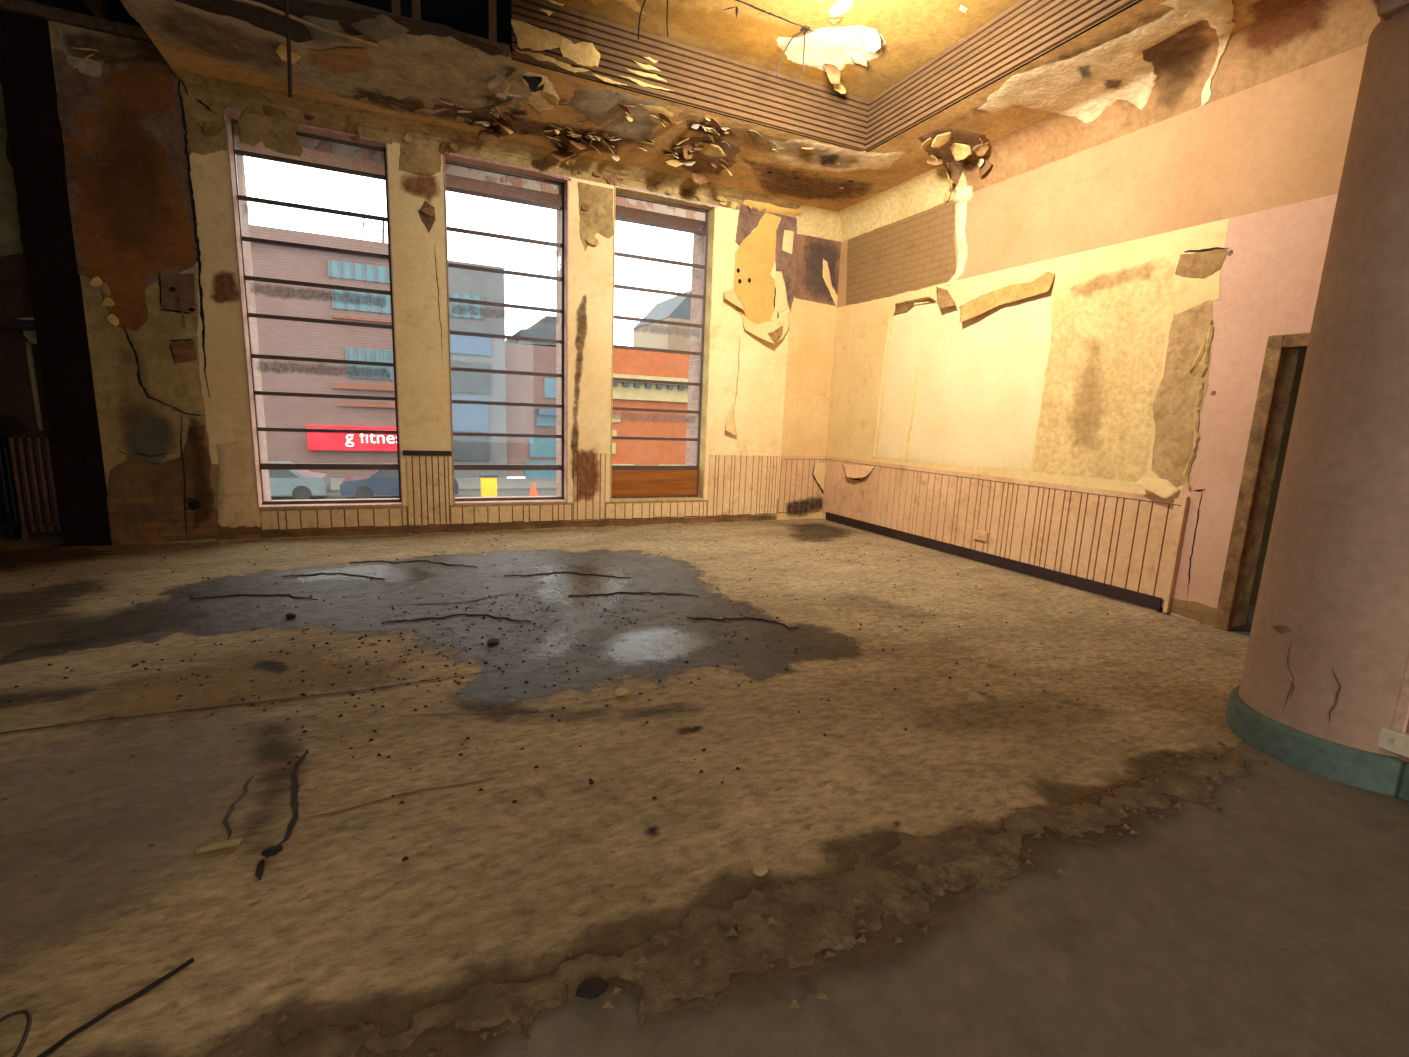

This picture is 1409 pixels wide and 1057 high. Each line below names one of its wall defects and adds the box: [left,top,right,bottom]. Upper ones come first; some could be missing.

spalling [977,0,1235,123]
flaking render [0,84,23,257]
peeling [53,0,992,331]
crack [116,79,213,541]
flaking render [169,339,197,364]
leakage [571,297,599,500]
flaking render [1033,247,1233,491]
flaking render [107,424,776,546]
leakage [0,550,860,705]
crack [1280,643,1294,714]
crack [1329,668,1342,723]